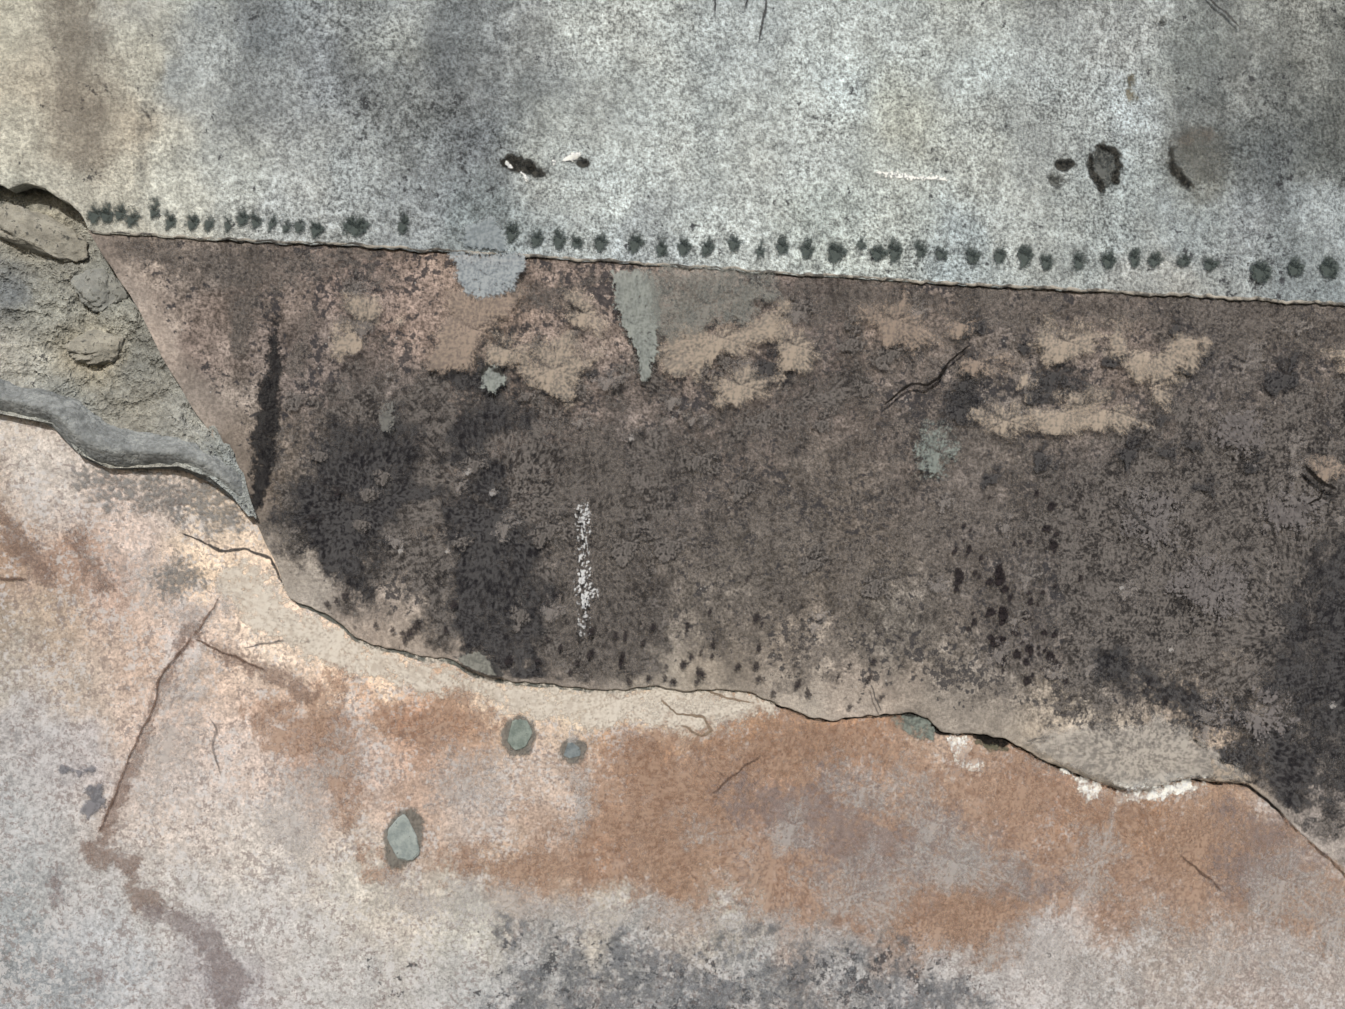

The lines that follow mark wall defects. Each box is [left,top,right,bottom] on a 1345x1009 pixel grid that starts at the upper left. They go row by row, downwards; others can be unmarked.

spalling [1048,141,1124,193]
spalling [1169,147,1193,190]
spalling [0,186,256,518]
water stain [939,314,990,426]
water stain [71,268,921,685]
water stain [952,329,1345,844]
corrosion [239,668,371,831]
corrosion [367,691,507,752]
crack [99,533,881,831]
crack [917,716,973,736]
crack [1006,736,1116,791]
crack [1161,728,1345,877]